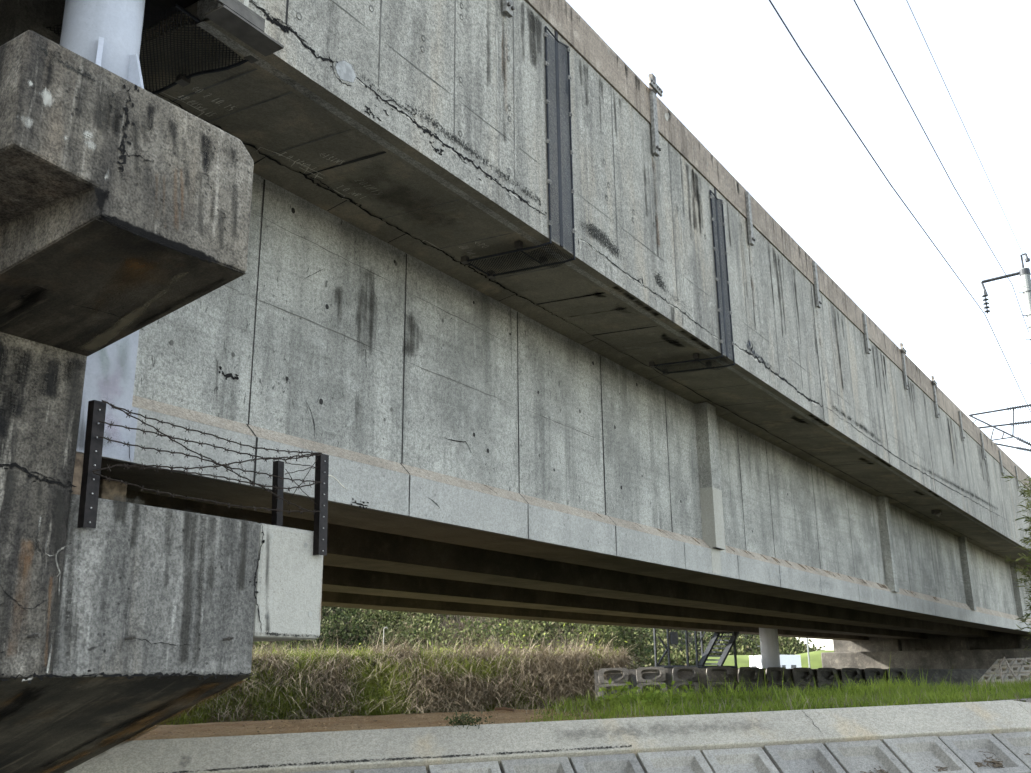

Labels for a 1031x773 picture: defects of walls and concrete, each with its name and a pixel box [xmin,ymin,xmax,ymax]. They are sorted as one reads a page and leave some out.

damp [522,4,541,65]
crack [249,0,547,217]
damp [202,134,210,185]
damp [681,165,703,232]
damp [82,279,222,350]
damp [358,276,374,347]
damp [404,315,418,353]
crack [117,84,1003,552]
damp [0,343,83,436]
damp [74,415,86,450]
crack [0,462,77,493]
damp [47,593,77,673]